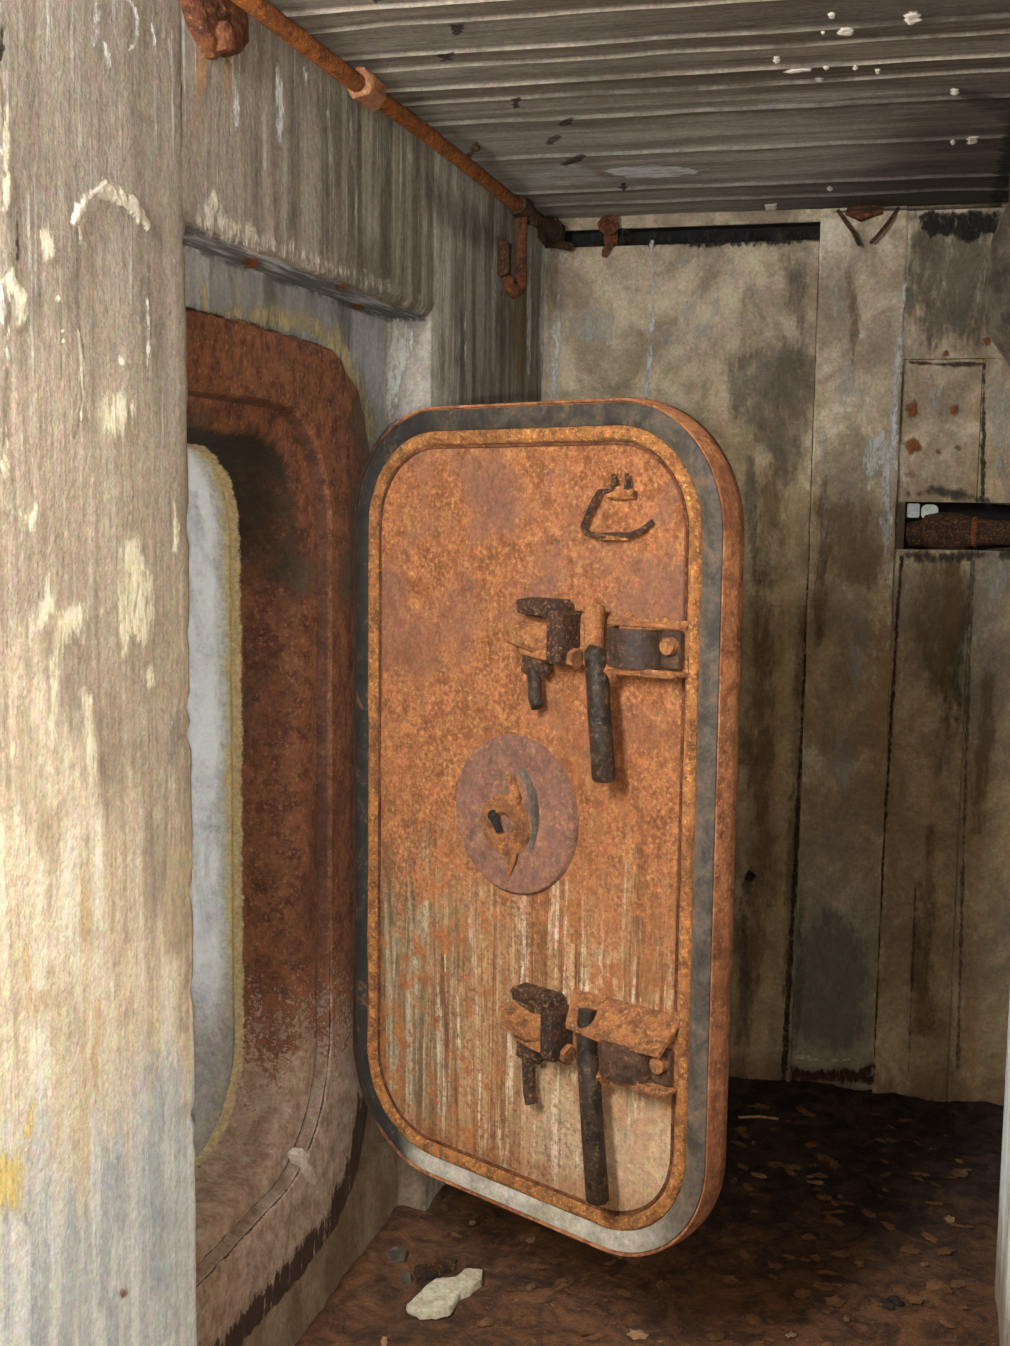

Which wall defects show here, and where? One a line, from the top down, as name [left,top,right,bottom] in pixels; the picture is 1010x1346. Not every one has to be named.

corrosion [242,258,261,268]
leakage [742,617,798,921]